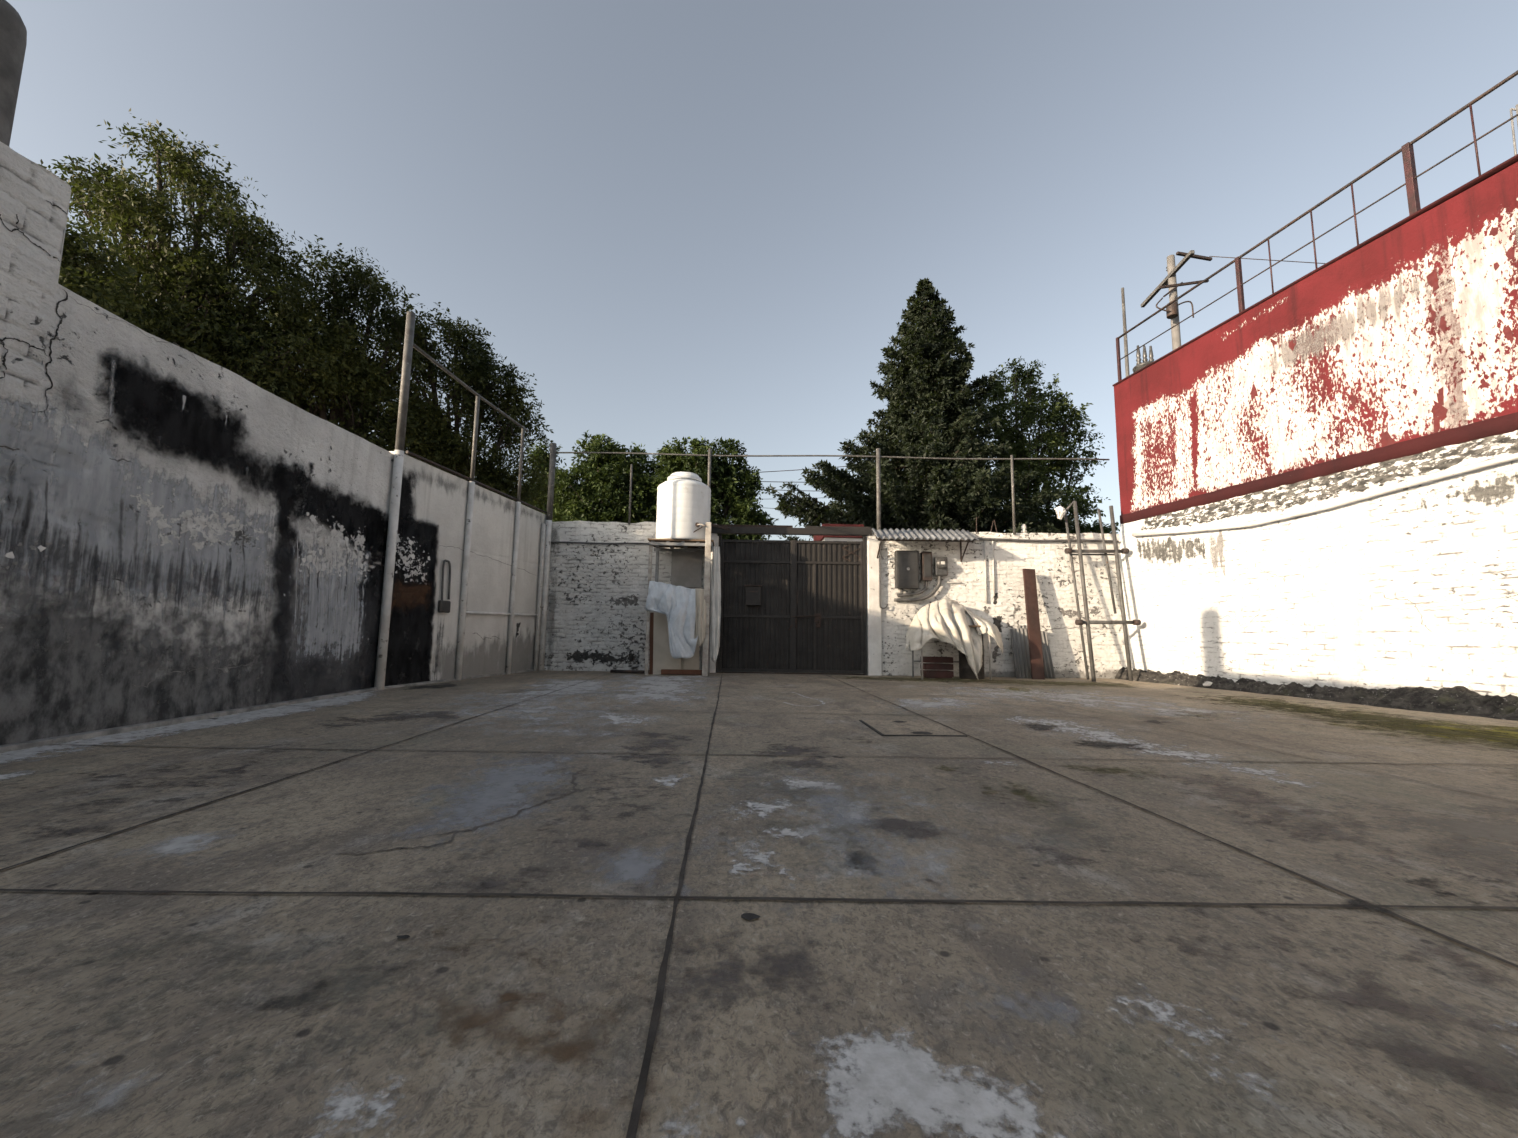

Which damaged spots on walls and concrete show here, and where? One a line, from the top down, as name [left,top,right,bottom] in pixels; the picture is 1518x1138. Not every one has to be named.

crack [0,200,205,556]
peeling [1130,198,1518,511]
damp [0,361,369,662]
damp [154,834,218,854]
damp [0,596,721,842]
crack [331,769,585,855]
peeling [566,541,641,670]